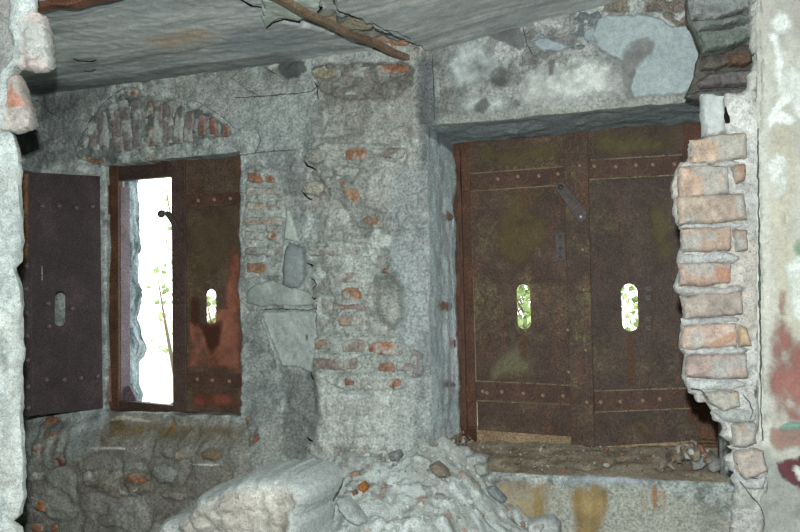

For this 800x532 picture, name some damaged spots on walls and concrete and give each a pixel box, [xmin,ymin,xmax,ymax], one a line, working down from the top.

flaking render [76,87,231,164]
crack [231,66,319,99]
flaking render [448,41,501,87]
flaking render [461,97,507,115]
leakage [624,39,653,82]
flaking render [241,165,287,279]
flaking render [317,142,408,229]
flaking render [521,0,800,532]
flaking render [261,239,423,390]
leakage [572,476,640,532]